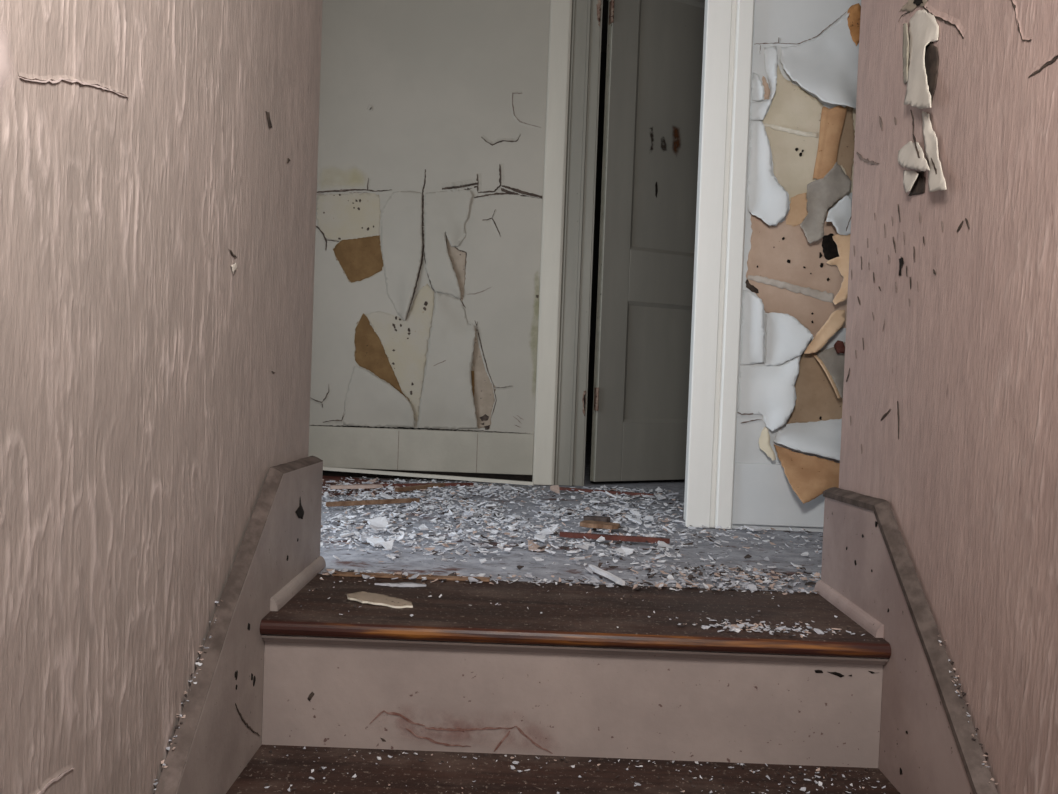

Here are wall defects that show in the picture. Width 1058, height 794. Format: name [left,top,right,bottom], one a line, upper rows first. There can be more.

crack [1011,0,1058,78]
peeling [898,0,947,196]
crack [316,226,339,250]
flaking render [316,193,384,283]
crack [317,178,392,196]
flaking render [446,236,467,307]
crack [405,91,542,319]
flaking render [746,65,854,343]
peeling [354,313,414,402]
crack [309,321,530,434]
flaking render [471,328,496,430]
flaking render [786,350,843,424]